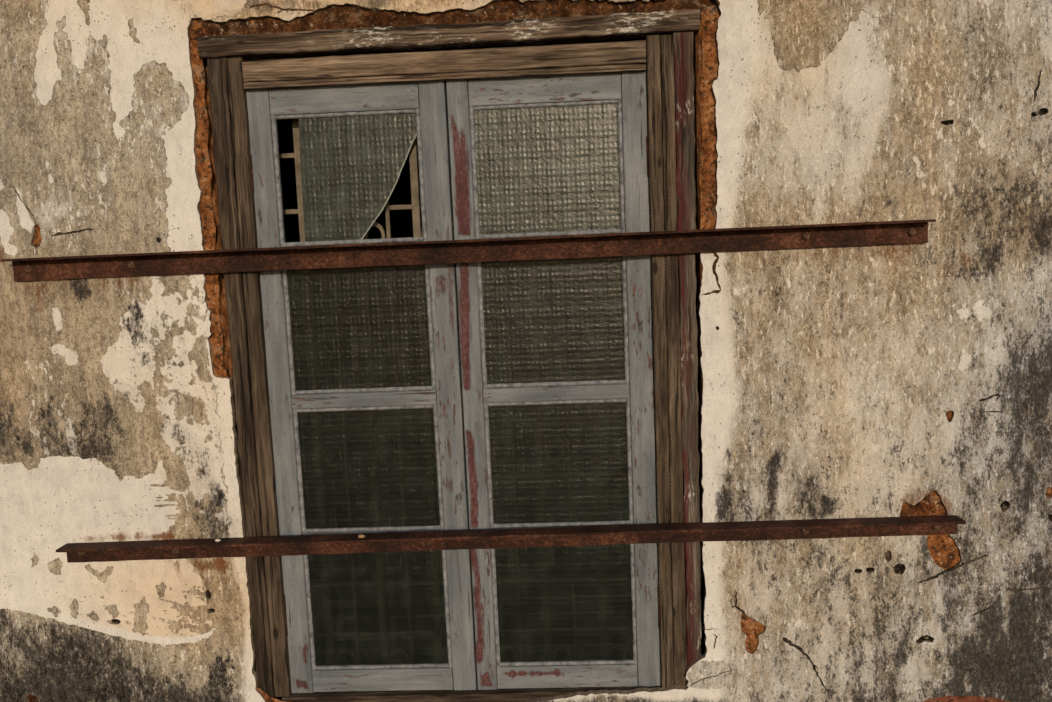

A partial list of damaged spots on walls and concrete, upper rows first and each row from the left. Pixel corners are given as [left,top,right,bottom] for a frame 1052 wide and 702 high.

crack [249,3,314,13]
peeling [757,0,898,75]
peeling [0,0,720,540]
flaking render [900,490,946,517]
peeling [30,554,63,575]
rust [113,532,174,541]
flaking render [927,534,961,570]
peeling [47,598,120,623]
peeling [132,582,167,636]
peeling [469,549,492,686]
flaking render [741,613,765,653]
water stain [0,609,240,702]